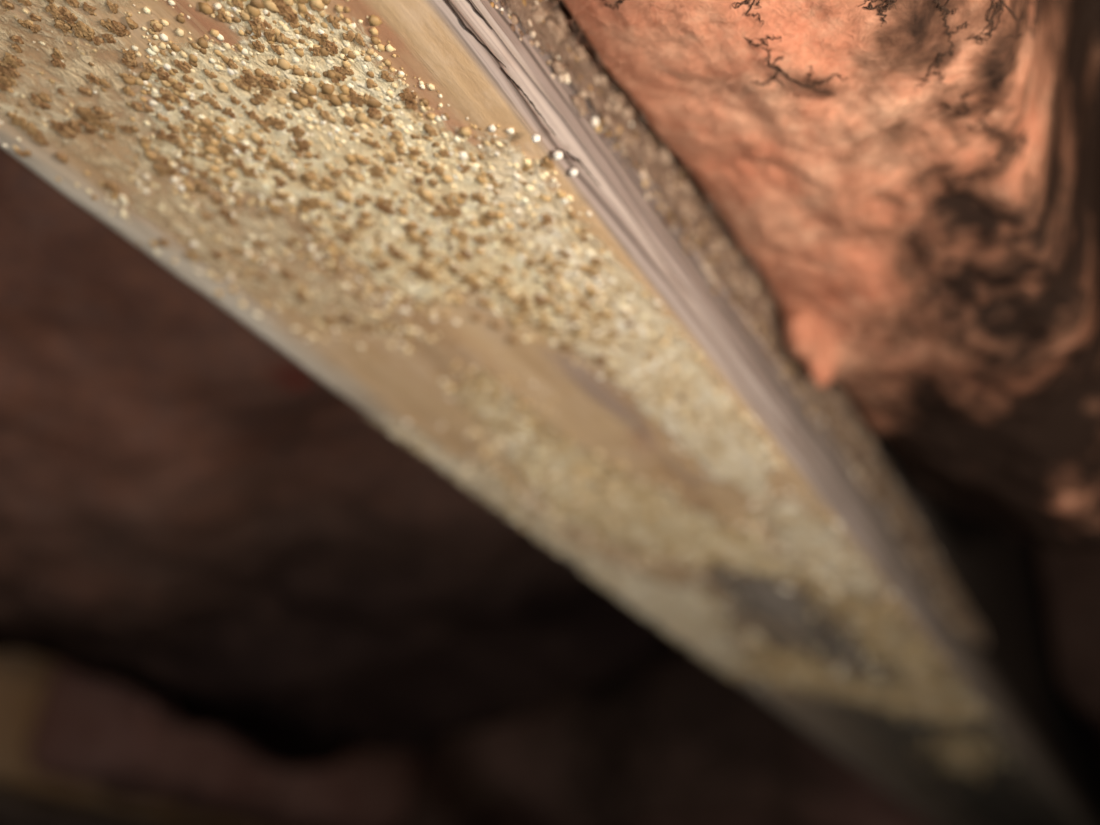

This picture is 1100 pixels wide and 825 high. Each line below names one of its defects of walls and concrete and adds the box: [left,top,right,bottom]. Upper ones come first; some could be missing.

leakage [0,0,782,508]
leakage [490,0,987,646]
leakage [926,91,1028,169]
leakage [915,0,1041,90]
leakage [366,367,1067,825]